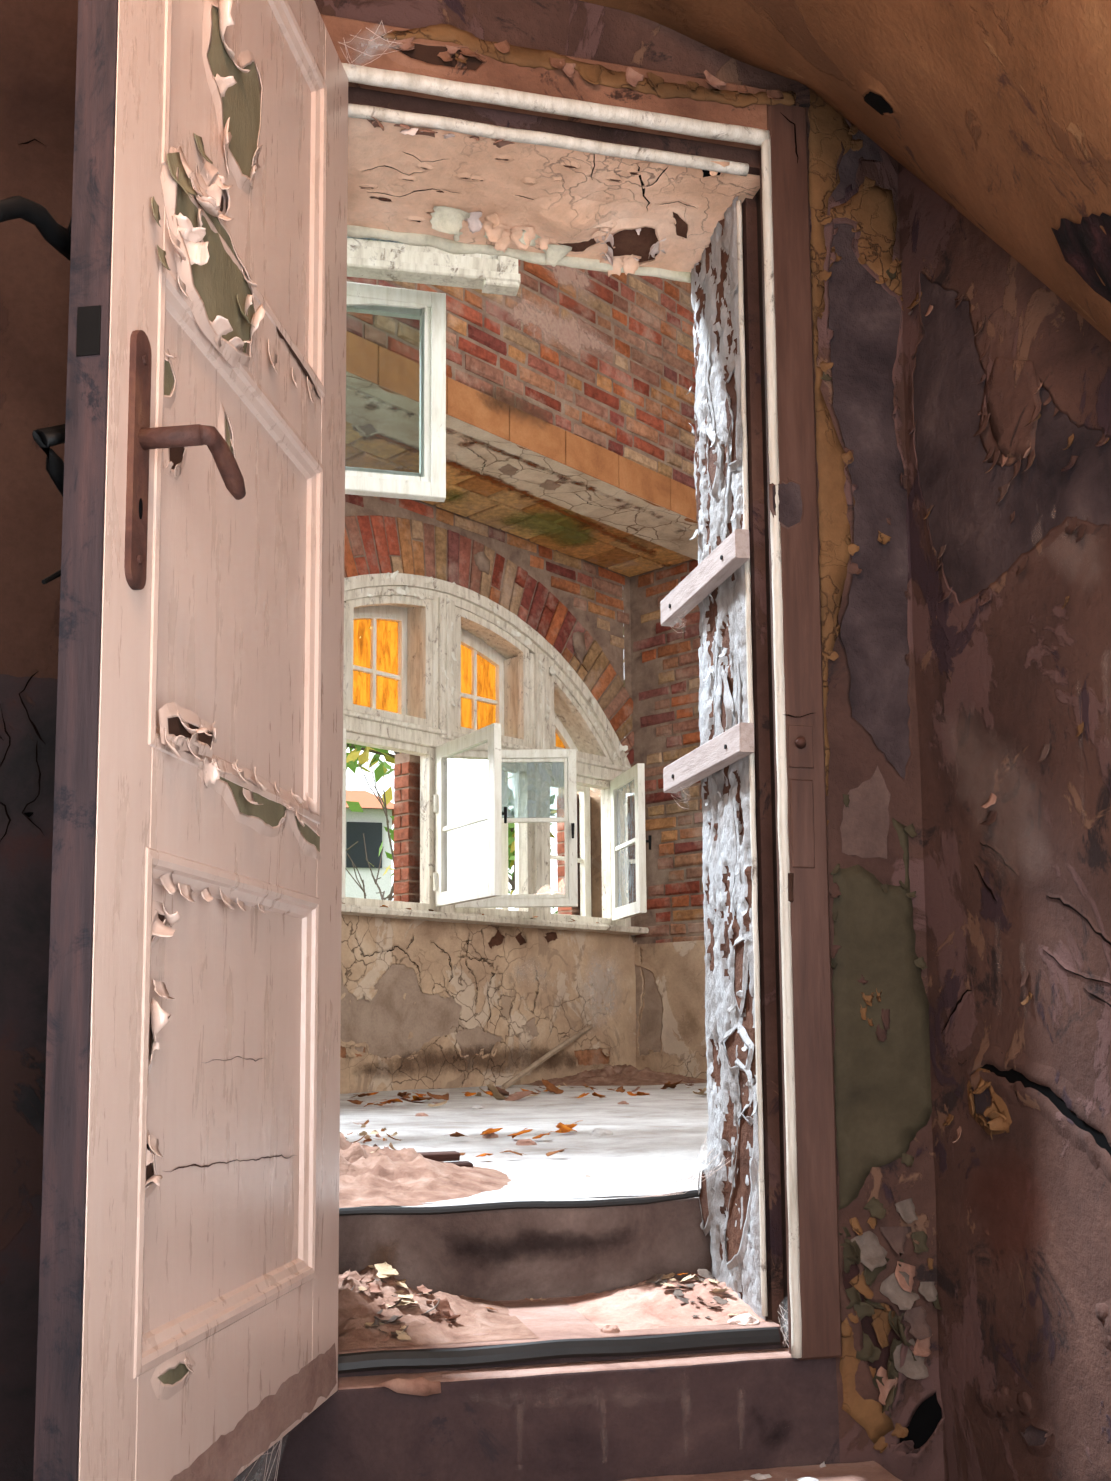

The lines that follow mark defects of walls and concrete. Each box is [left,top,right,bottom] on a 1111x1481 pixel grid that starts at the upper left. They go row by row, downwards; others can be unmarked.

crack [512,192,540,201]
crack [587,153,699,211]
crack [352,931,541,1033]
crack [940,987,1111,1183]